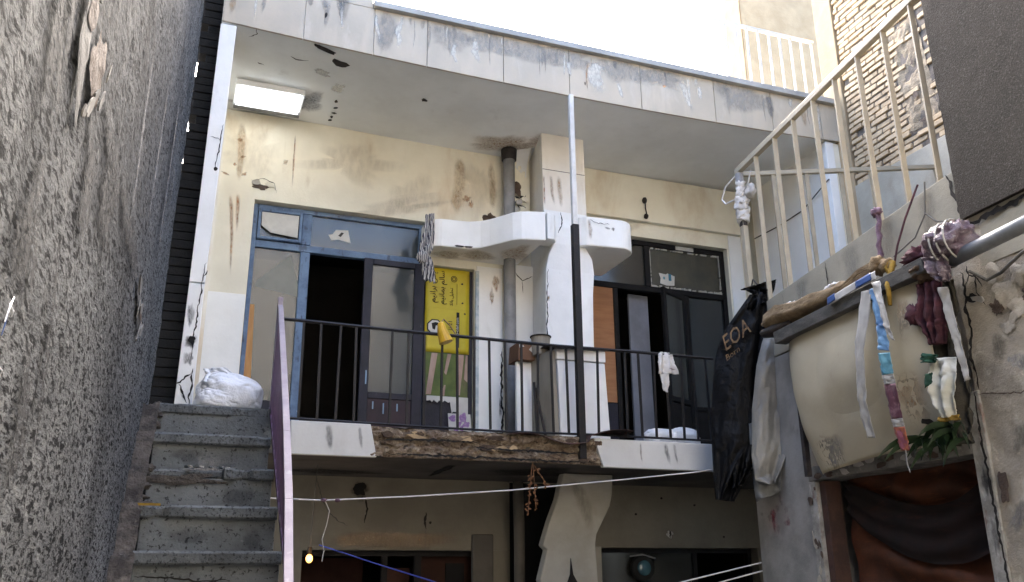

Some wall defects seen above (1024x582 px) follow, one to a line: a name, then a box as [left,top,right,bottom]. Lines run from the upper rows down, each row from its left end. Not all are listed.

spalling [75,0,113,124]
peeling [314,44,350,121]
water stain [428,27,702,106]
crack [210,124,224,171]
peeling [252,178,276,190]
crack [175,265,208,404]
peeling [983,262,1024,334]
spalling [370,426,602,465]
crack [960,266,1024,582]